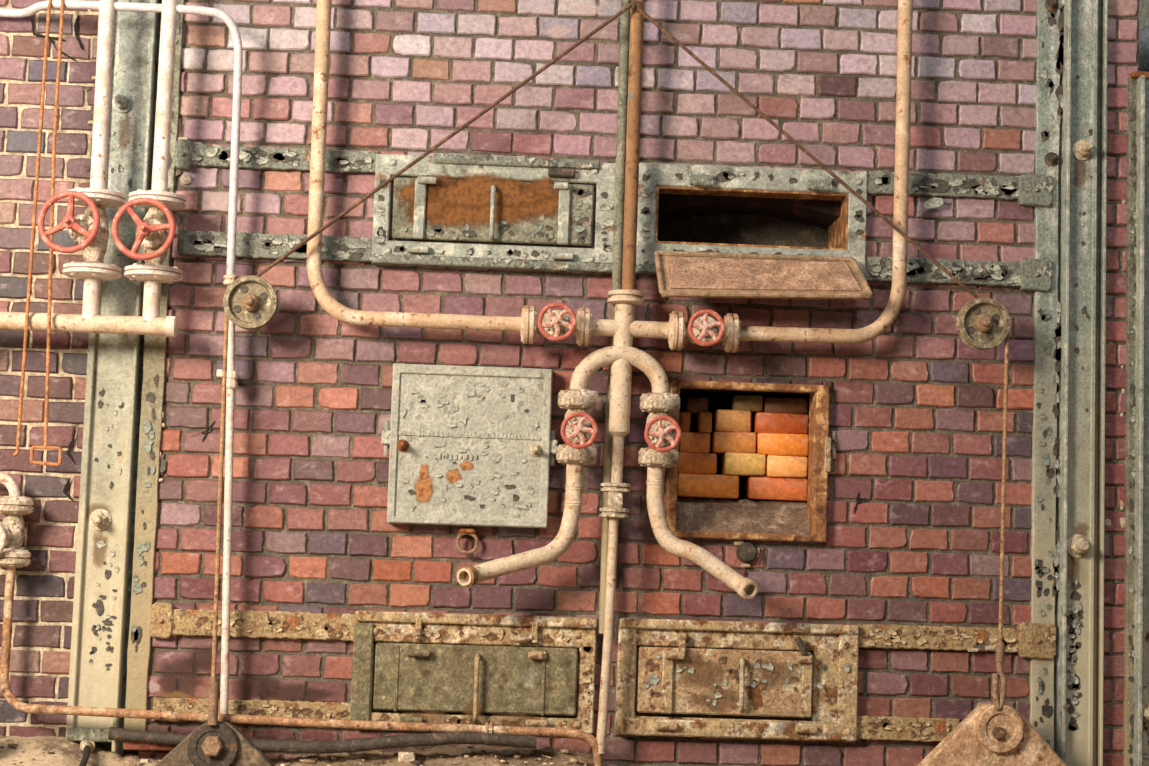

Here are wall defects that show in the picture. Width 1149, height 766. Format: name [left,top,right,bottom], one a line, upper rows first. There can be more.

peeling [1041,0,1080,142]
rust [400,174,559,227]
peeling [132,510,150,594]
peeling [144,373,166,487]
rust [415,464,433,502]
rust [446,461,473,483]
peeling [1034,302,1083,730]
peeling [89,541,119,670]
peeling [131,625,142,652]
rust [747,685,762,710]